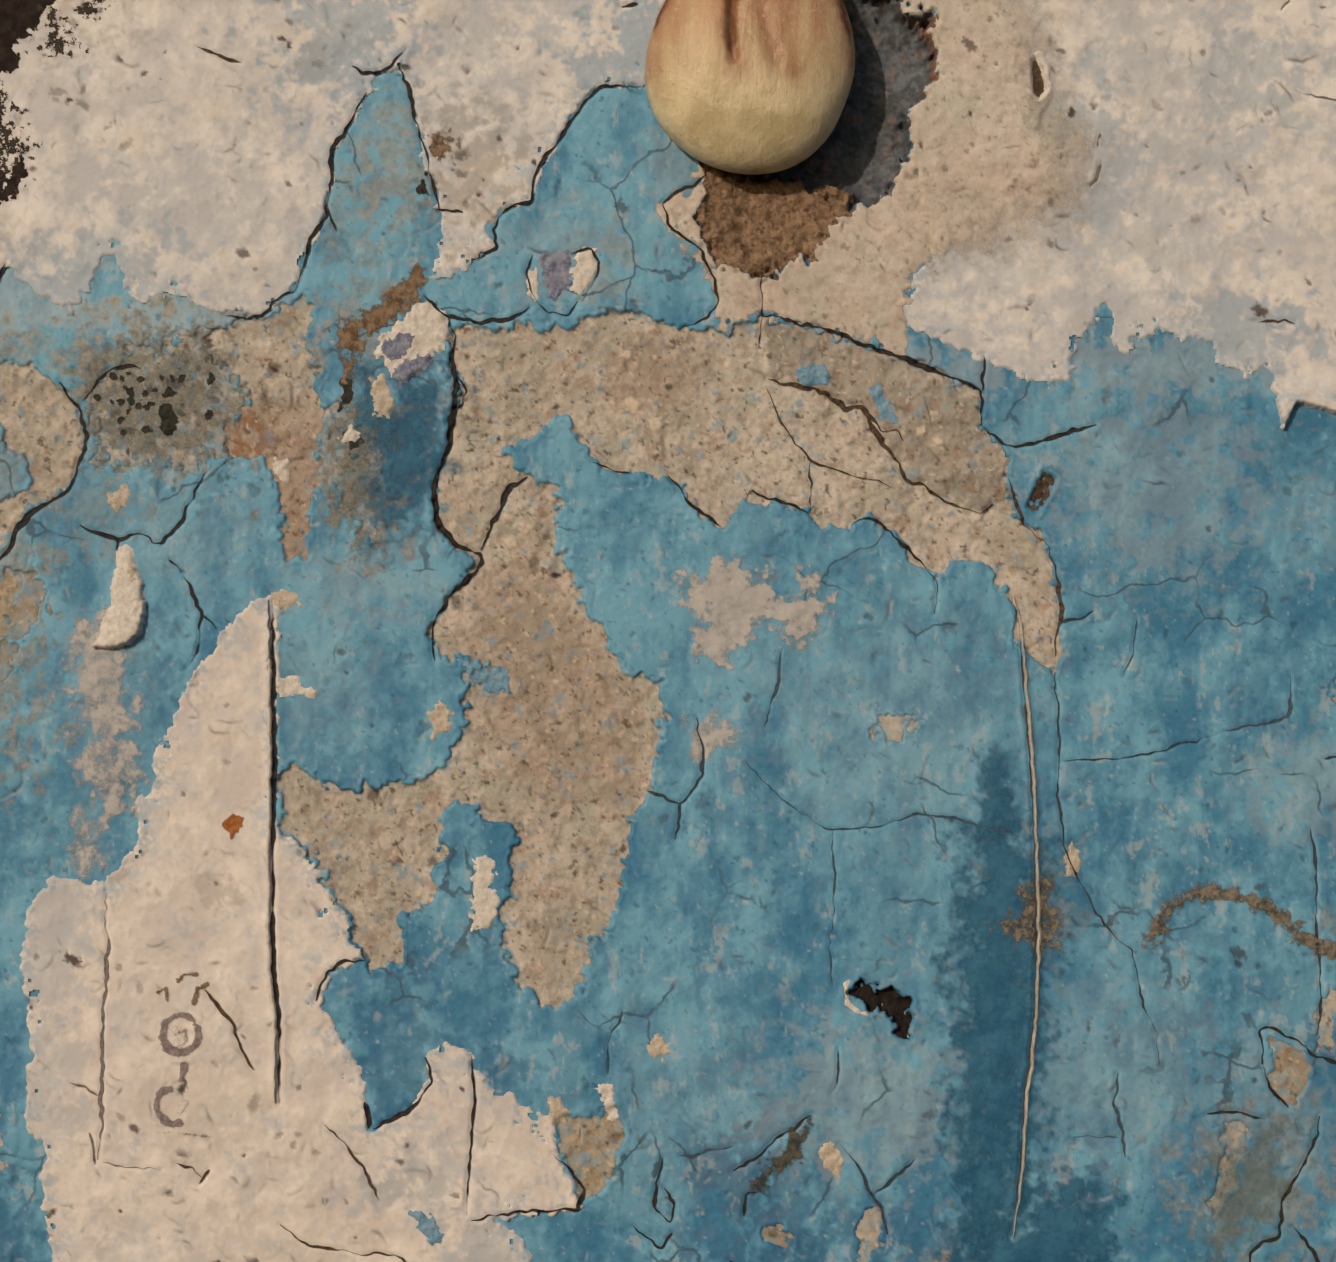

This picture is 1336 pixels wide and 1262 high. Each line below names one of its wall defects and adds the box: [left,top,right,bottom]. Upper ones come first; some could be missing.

leakage [0,0,124,204]
crack [227,47,463,319]
crack [475,84,641,260]
peeling [91,544,148,650]
spalling [0,295,398,561]
crack [423,247,599,661]
spalling [276,0,1094,1008]
crack [204,600,281,1103]
peeling [19,589,625,1262]
crack [326,1057,432,1199]
crack [466,1056,585,1221]
spalling [855,1206,885,1262]